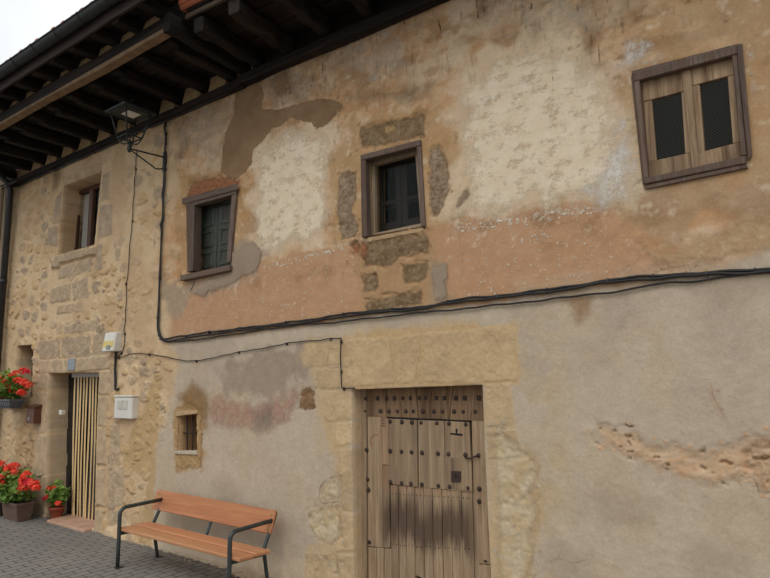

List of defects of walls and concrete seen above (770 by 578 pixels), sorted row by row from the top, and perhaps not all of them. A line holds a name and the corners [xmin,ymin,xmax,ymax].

peeling [185,82,429,329]
peeling [428,53,642,297]
spalling [298,385,315,410]
spalling [488,419,544,578]
spalling [579,422,770,498]